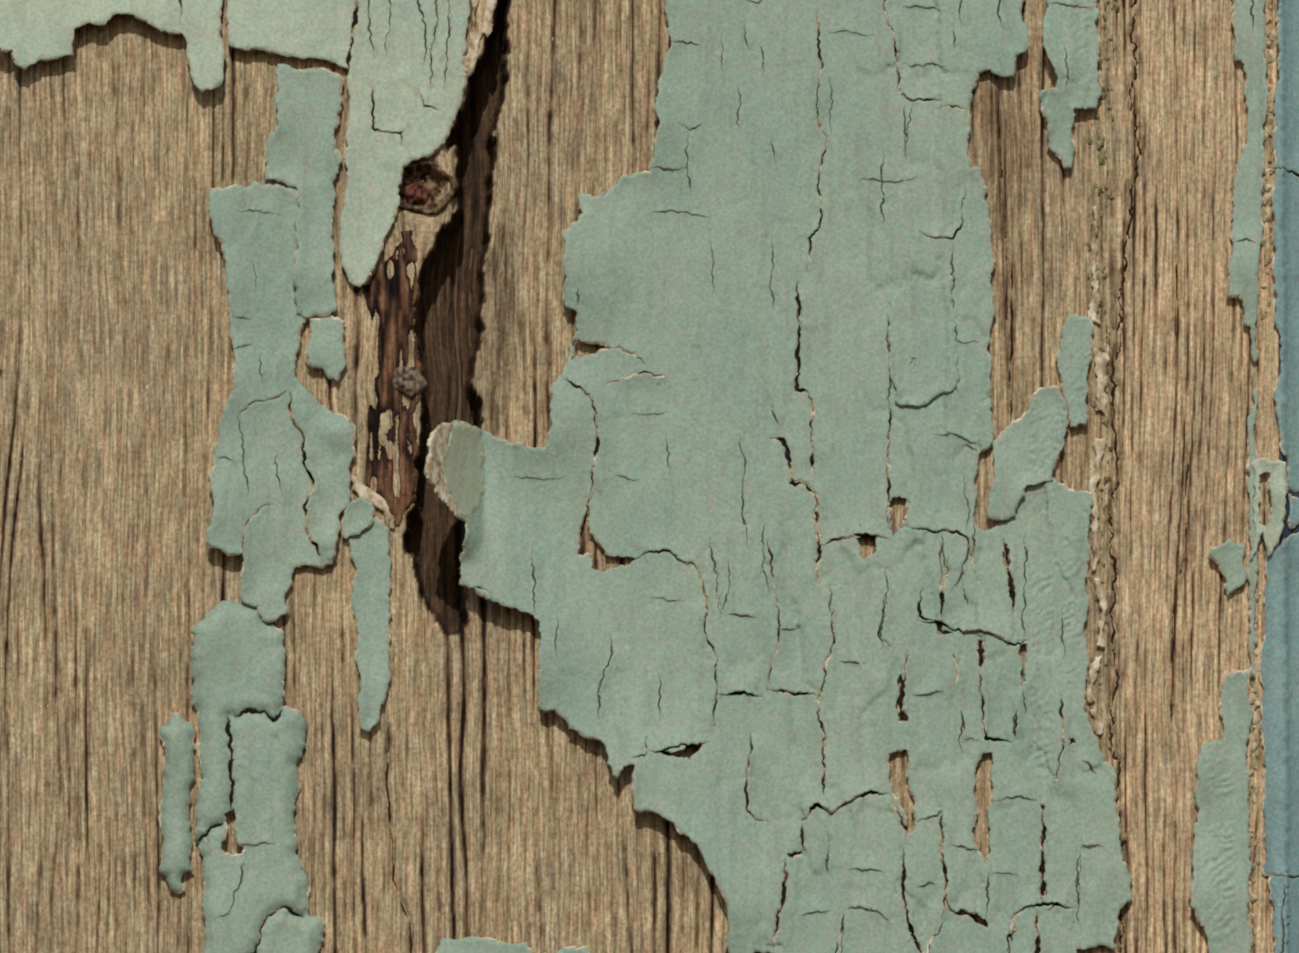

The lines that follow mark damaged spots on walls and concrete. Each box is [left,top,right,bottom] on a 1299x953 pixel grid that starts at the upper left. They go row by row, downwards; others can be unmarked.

crack [346,0,451,109]
crack [1248,0,1256,33]
crack [371,92,402,143]
crack [233,259,263,378]
peeling [0,0,497,953]
crack [519,380,670,487]
peeling [424,0,1133,953]
crack [638,0,1142,953]
crack [530,553,559,656]
crack [597,634,613,720]
crack [1280,876,1299,953]